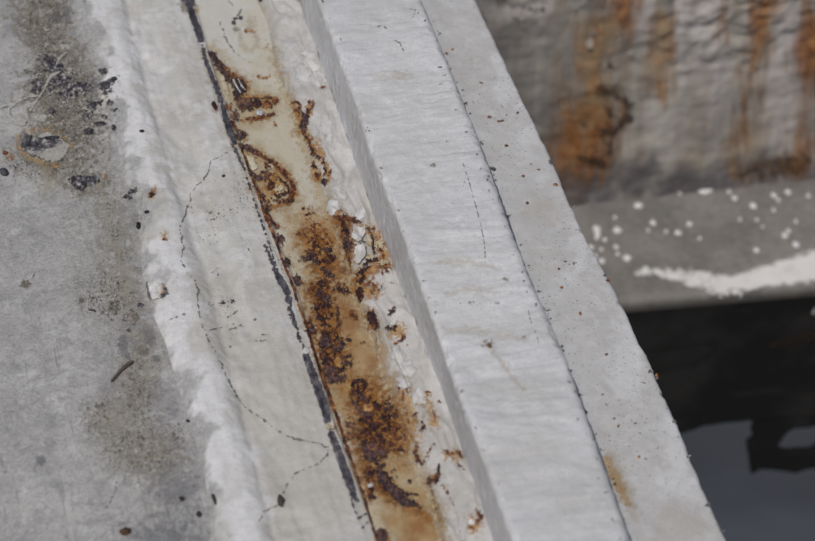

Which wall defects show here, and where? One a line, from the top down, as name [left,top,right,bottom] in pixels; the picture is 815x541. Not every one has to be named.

water stain [74,181,195,480]
crack [170,152,329,521]
corrosion [207,50,447,541]
water stain [635,250,815,297]